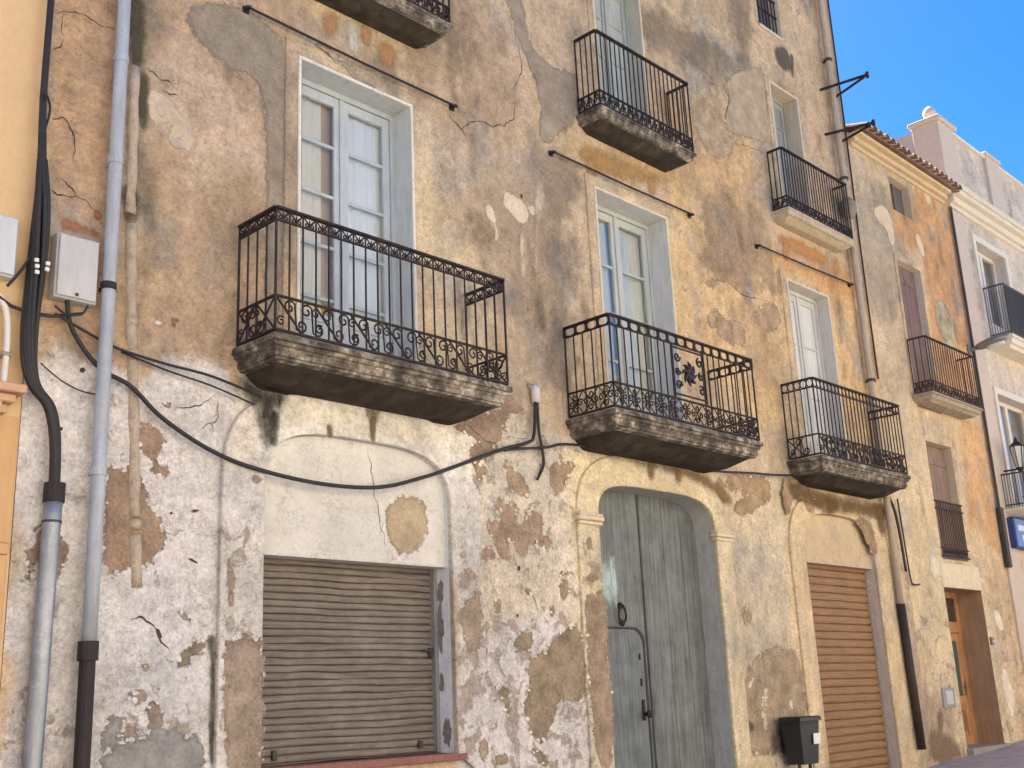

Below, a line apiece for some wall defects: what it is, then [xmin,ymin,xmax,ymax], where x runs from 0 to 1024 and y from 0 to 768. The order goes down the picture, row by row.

crack [53,11,113,51]
crack [436,10,522,136]
crack [51,117,94,210]
crack [179,397,219,431]
water stain [243,379,284,445]
peeling [455,395,527,482]
peeling [102,401,174,577]
peeling [482,460,551,565]
peeling [100,688,165,759]
crack [127,616,174,663]
peeling [221,633,266,768]
peeling [496,570,615,768]